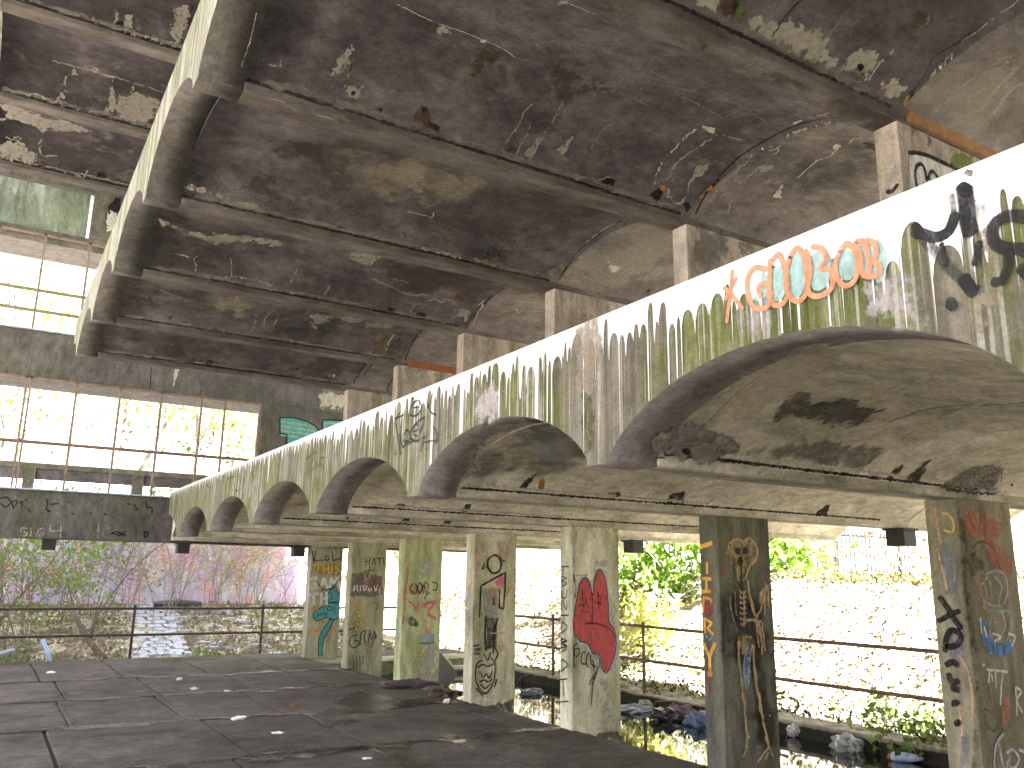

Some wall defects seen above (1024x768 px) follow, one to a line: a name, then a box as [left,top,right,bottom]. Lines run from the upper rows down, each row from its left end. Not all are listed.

peeling [170,5,190,44]
peeling [330,44,355,77]
peeling [0,60,164,165]
crack [99,55,871,391]
water stain [694,229,754,274]
water stain [866,280,915,317]
water stain [973,228,1001,330]
spalling [651,423,741,465]
water stain [772,392,885,469]
spalling [940,464,1004,497]